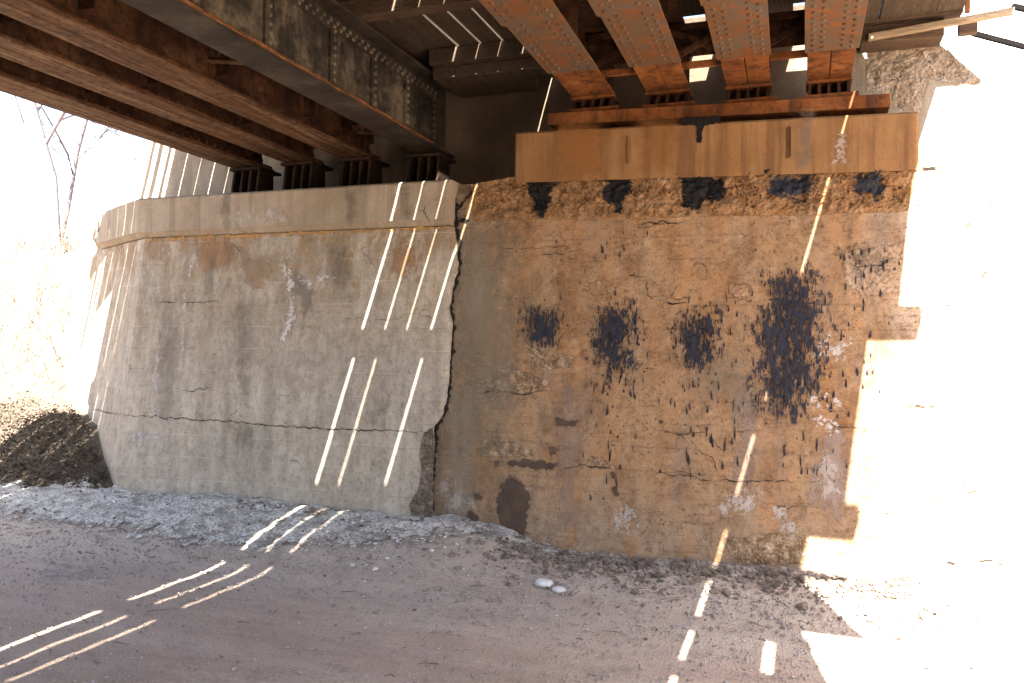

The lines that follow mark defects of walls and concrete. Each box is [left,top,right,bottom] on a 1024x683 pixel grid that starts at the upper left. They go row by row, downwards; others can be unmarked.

spalling [470,170,915,221]
damp [704,177,727,204]
crack [94,188,473,515]
damp [437,226,557,537]
efflorescence [813,334,852,361]
spalling [409,427,435,517]